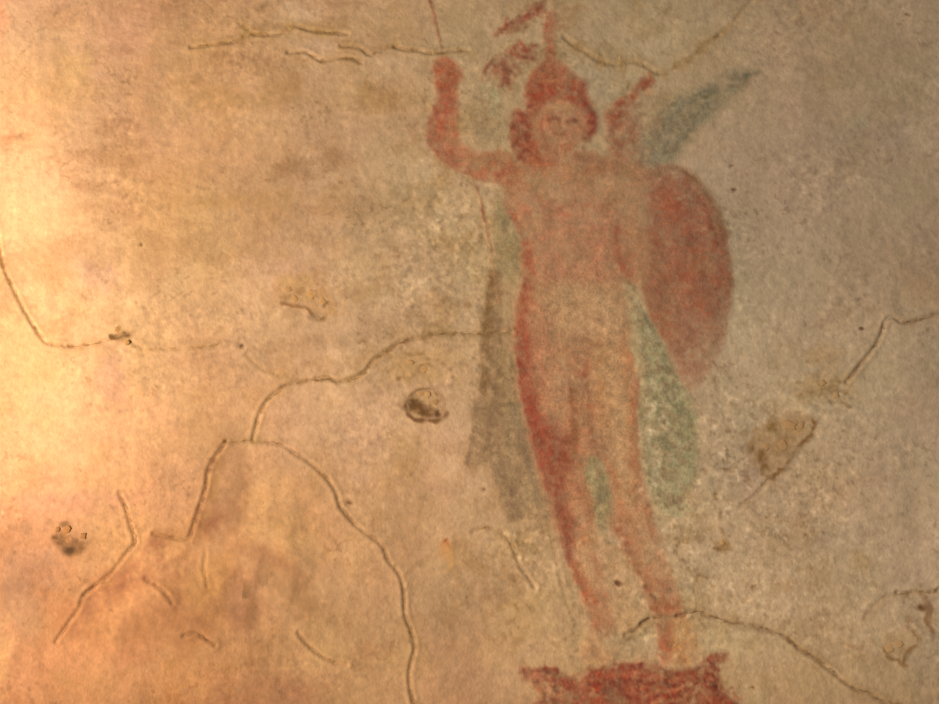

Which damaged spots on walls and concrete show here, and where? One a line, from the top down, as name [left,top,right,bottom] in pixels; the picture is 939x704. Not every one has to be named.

crack [0,248,110,348]
crack [847,318,925,381]
crack [167,330,508,539]
spalling [403,387,448,424]
spalling [747,415,817,480]
spalling [52,522,86,557]
crack [630,611,898,704]